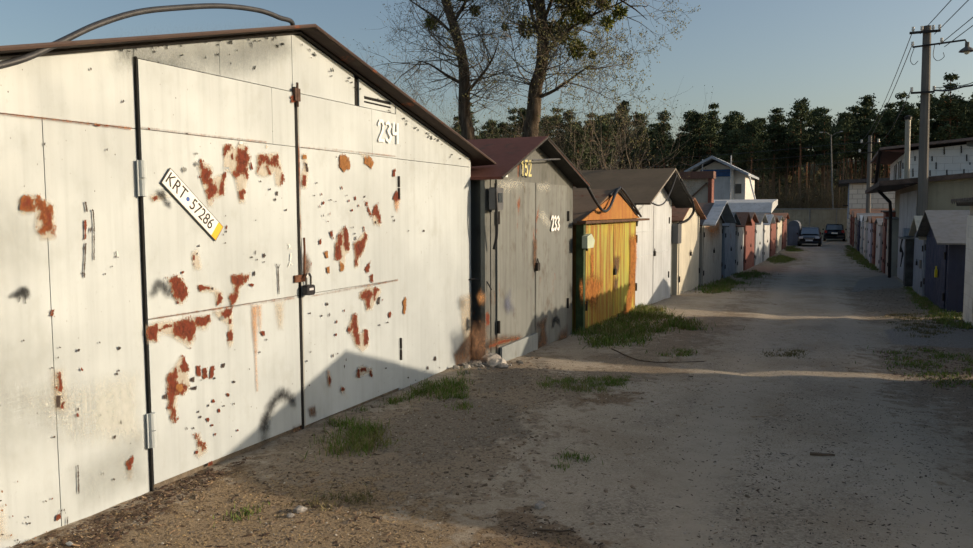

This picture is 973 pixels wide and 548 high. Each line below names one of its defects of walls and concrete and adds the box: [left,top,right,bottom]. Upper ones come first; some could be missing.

corrosion [199,140,285,202]
corrosion [336,152,351,172]
corrosion [20,186,57,235]
corrosion [319,202,398,346]
corrosion [146,273,254,344]
corrosion [454,312,519,366]
corrosion [163,355,225,423]